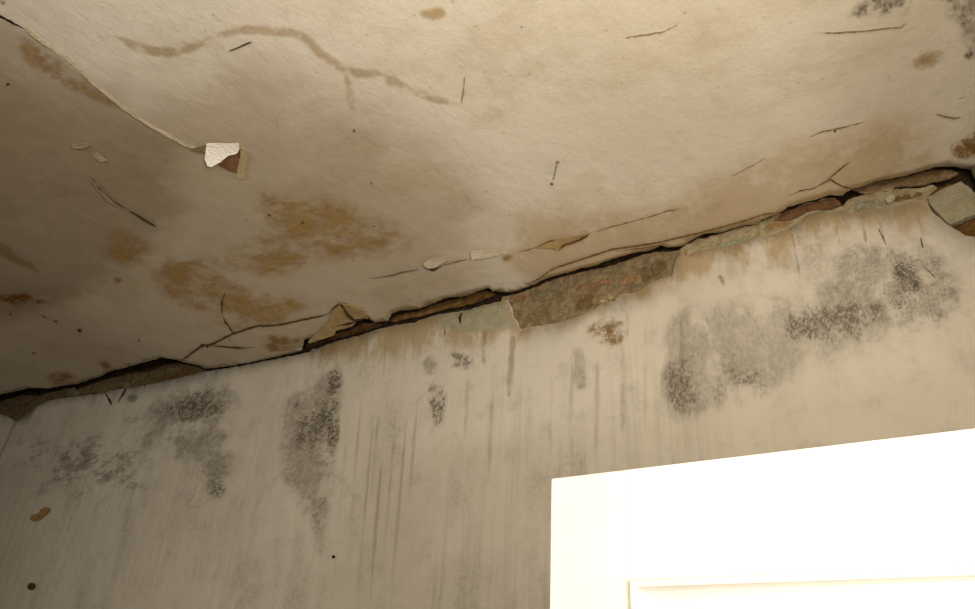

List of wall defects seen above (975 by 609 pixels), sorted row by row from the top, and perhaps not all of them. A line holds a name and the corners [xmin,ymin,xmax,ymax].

peeling [22,25,247,179]
crack [626,24,678,38]
rust [954,132,975,158]
crack [0,162,975,405]
spalling [501,179,975,329]